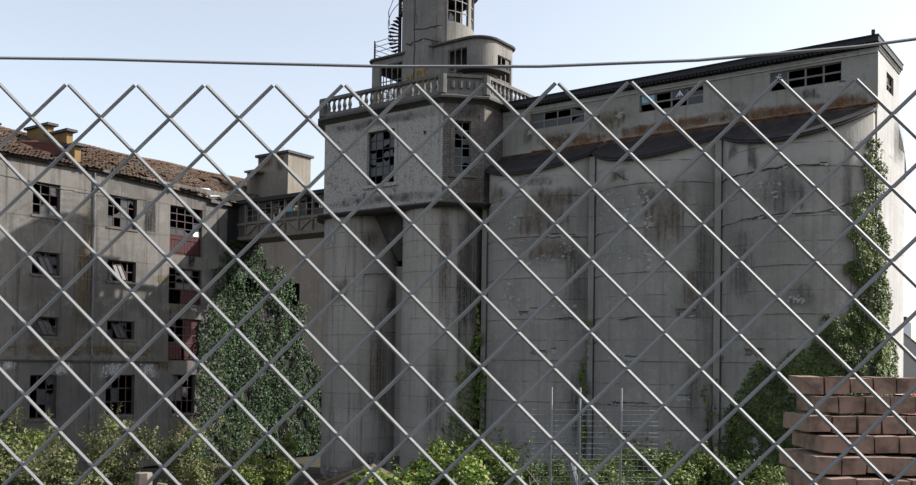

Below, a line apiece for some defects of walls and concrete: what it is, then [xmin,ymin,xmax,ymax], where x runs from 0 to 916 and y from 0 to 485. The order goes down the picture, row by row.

crack [406,4,442,78]
corrosion [623,117,709,135]
crack [738,202,852,222]
damp [439,223,474,318]